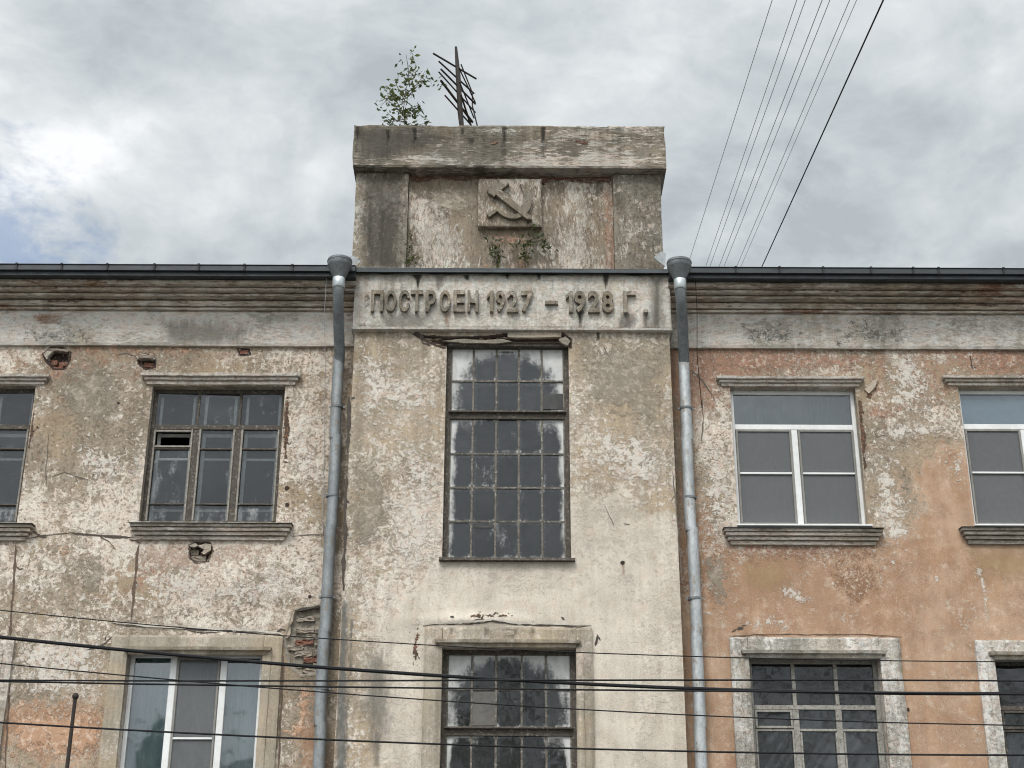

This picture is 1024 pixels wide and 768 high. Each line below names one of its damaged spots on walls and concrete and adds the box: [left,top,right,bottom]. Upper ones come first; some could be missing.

peeling [42,347,198,495]
peeling [414,332,677,530]
peeling [689,350,951,615]
crack [9,532,286,768]
peeling [136,541,334,741]
flaking render [413,612,513,665]